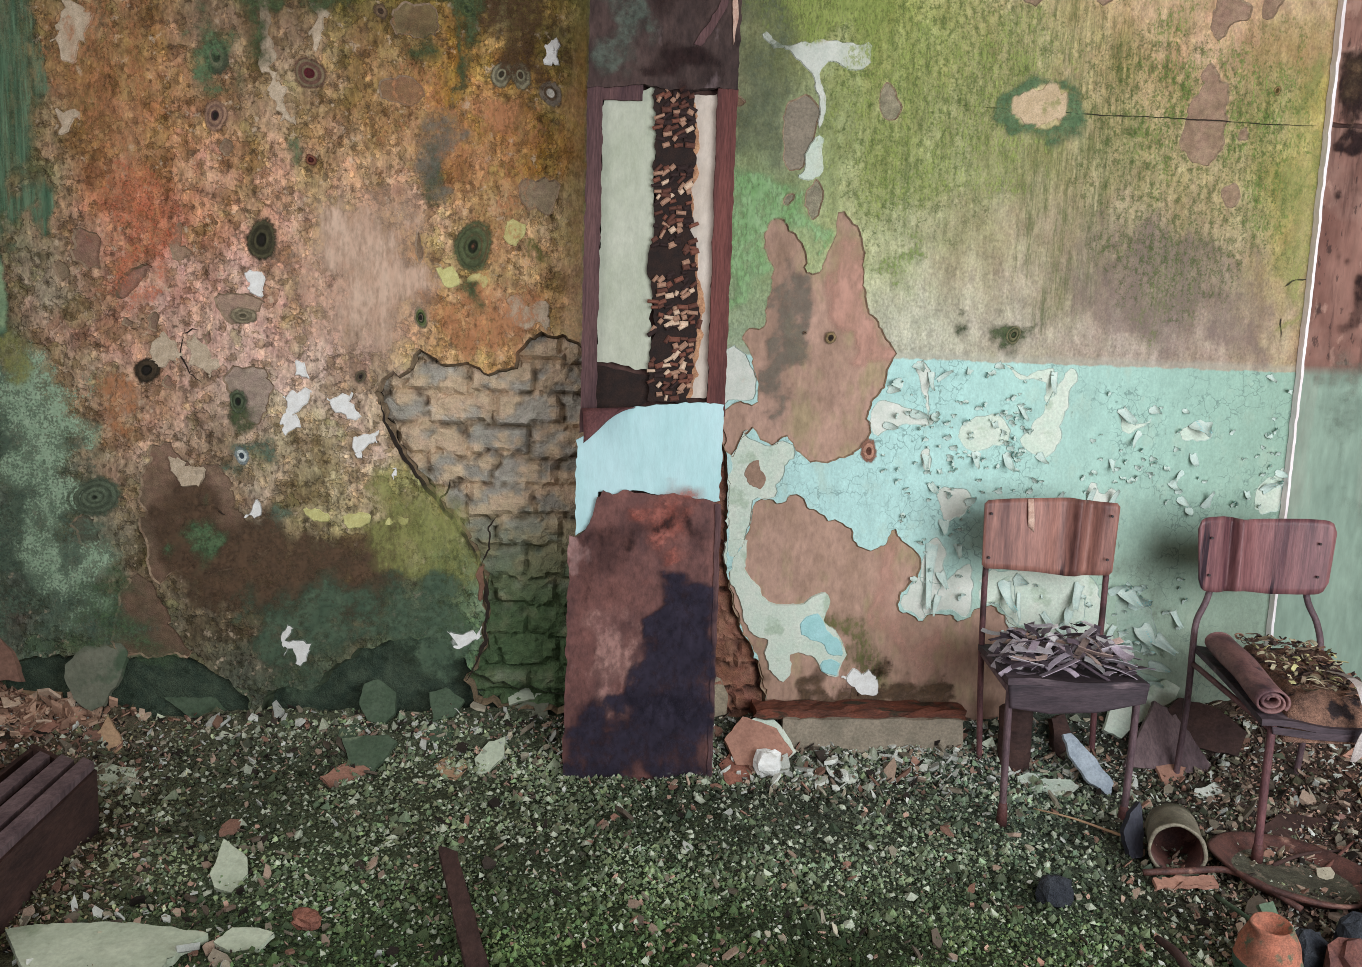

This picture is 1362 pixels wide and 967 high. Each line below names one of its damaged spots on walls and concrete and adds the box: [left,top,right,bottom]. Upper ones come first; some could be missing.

peeling [1210,0,1285,41]
peeling [782,94,820,171]
peeling [1179,63,1249,166]
flaking render [66,441,246,585]
flaking render [107,331,584,718]
peeling [715,179,1189,721]
peeling [1081,405,1215,517]
peeling [1230,417,1288,515]
flaking render [1,654,77,703]